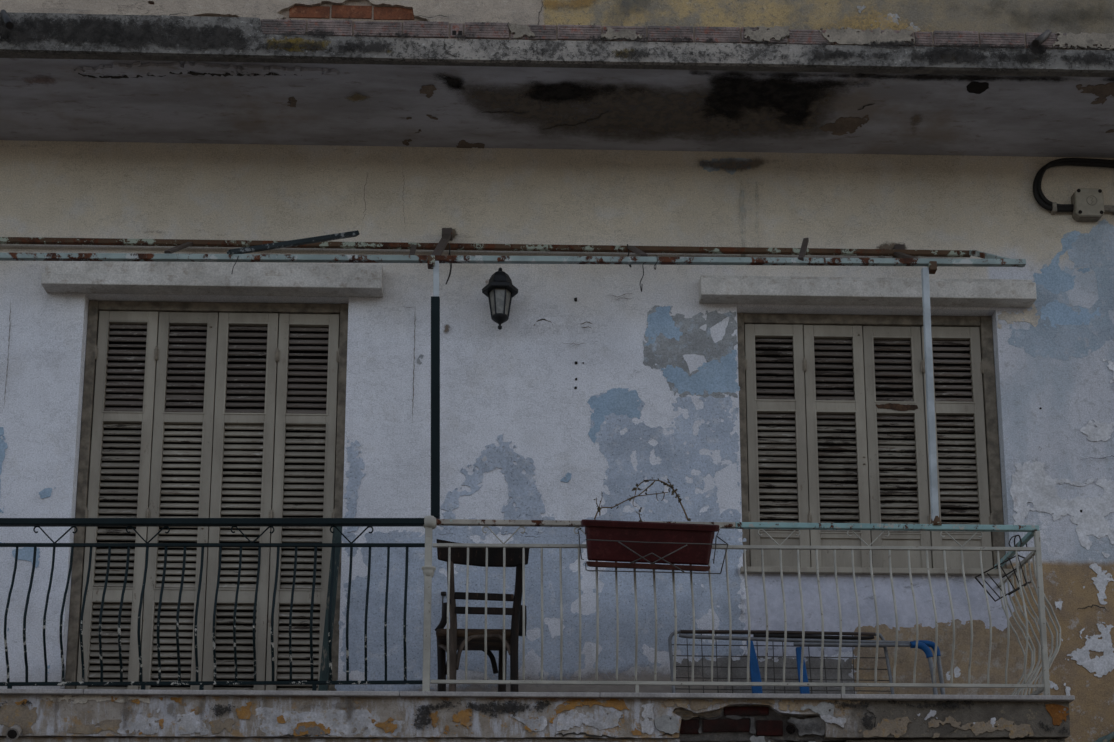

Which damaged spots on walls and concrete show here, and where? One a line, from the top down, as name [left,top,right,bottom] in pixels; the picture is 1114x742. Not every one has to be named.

flaking render [261,0,845,45]
damp [567,23,789,59]
flaking render [862,13,1101,50]
damp [438,40,1114,140]
peeling [997,219,1114,383]
peeling [0,427,8,482]
peeling [0,542,40,568]
peeling [335,305,1034,742]
peeling [1010,460,1114,605]
peeling [1065,622,1114,678]
peeling [42,695,409,737]
peeling [1045,680,1071,726]